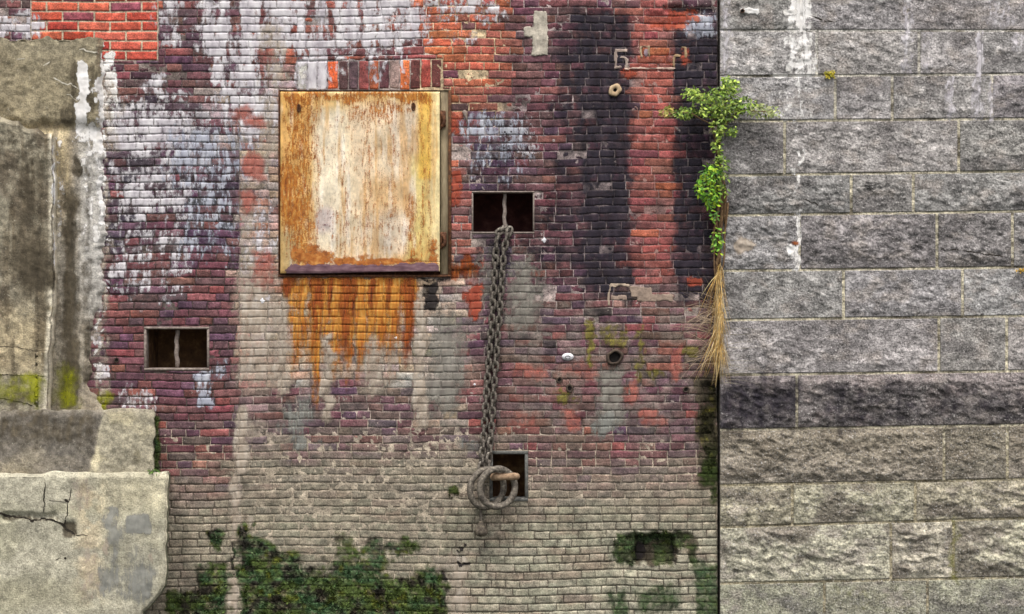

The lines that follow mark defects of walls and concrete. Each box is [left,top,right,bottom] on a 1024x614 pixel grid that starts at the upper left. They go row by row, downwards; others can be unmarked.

water stain [0,0,506,450]
rust [280,92,438,398]
water stain [505,259,541,329]
crack [0,484,88,560]